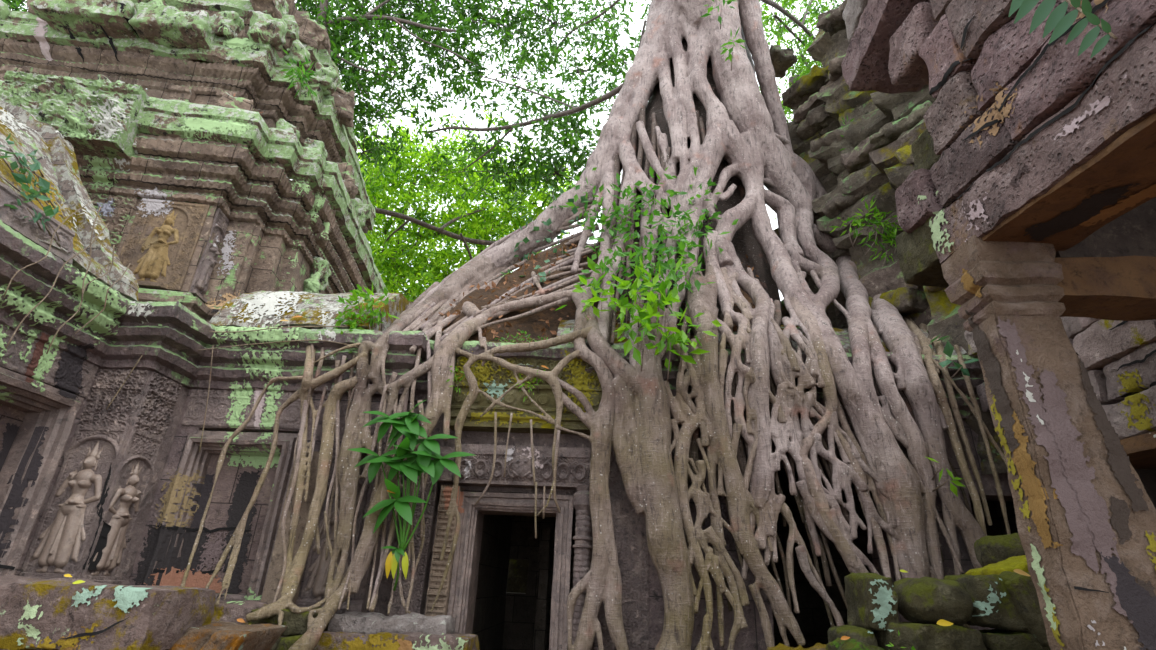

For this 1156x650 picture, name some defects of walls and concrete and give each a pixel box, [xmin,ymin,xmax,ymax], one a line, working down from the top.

crack [948,0,1156,206]
water stain [0,423,49,562]